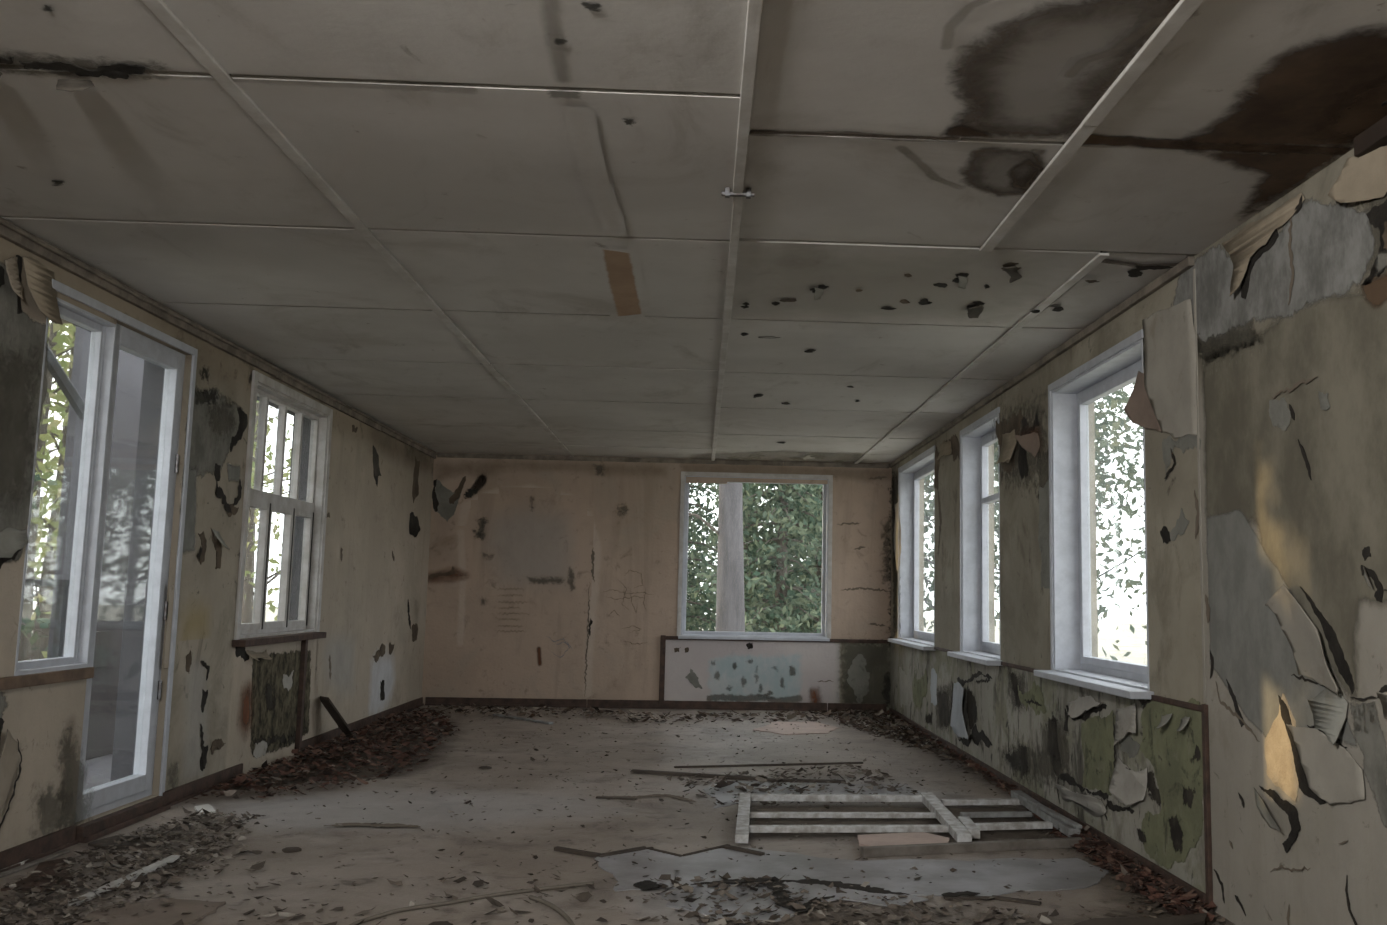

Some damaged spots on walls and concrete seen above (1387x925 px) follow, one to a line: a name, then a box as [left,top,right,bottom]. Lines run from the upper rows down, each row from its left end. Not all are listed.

peeling [0,53,165,92]
leakage [749,0,1387,216]
peeling [881,273,990,318]
peeling [1001,262,1022,283]
peeling [0,255,63,569]
peeling [180,388,248,569]
peeling [409,456,466,537]
peeling [1124,146,1387,853]
crack [584,549,595,696]
peeling [0,692,22,828]
peeling [899,666,992,748]
peeling [1017,681,1060,760]